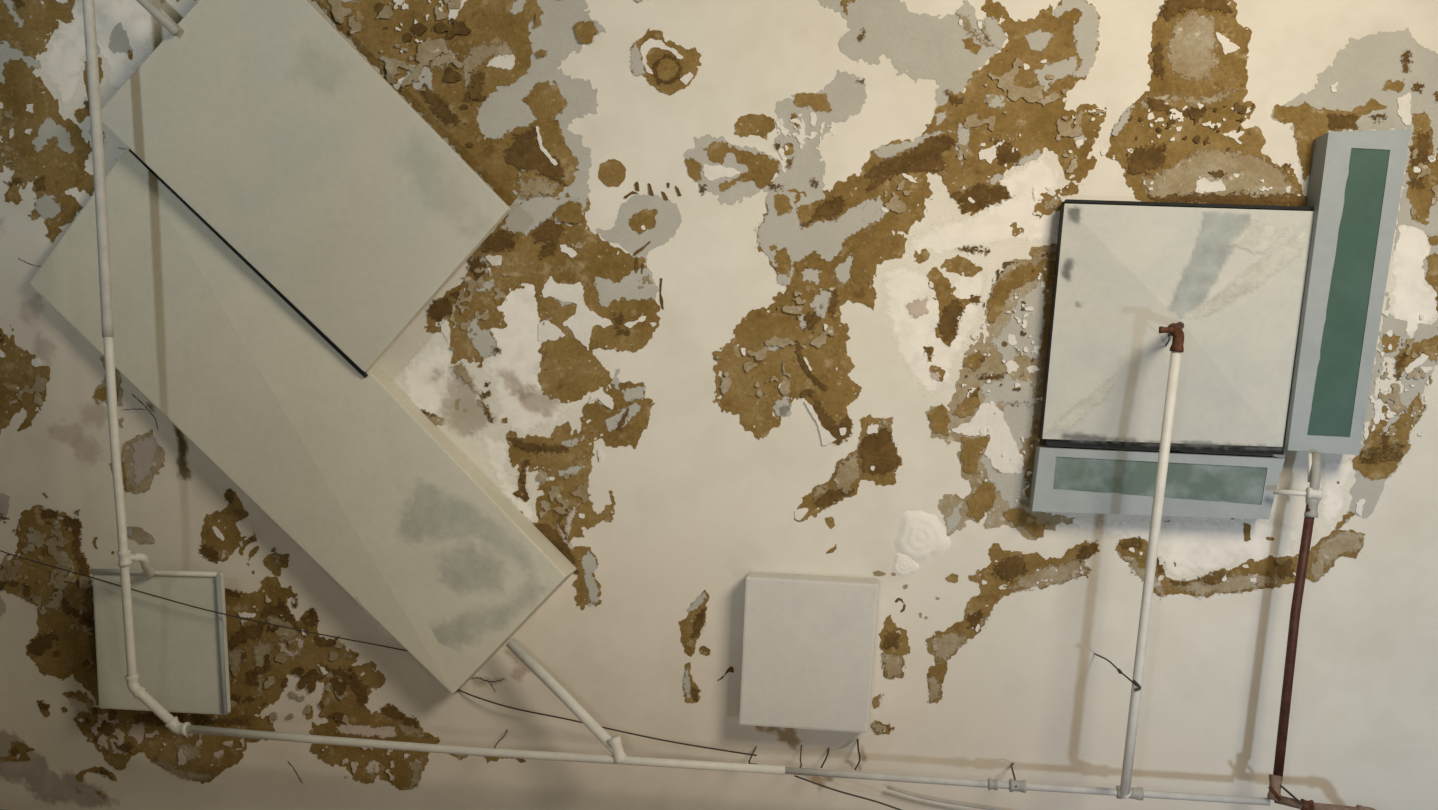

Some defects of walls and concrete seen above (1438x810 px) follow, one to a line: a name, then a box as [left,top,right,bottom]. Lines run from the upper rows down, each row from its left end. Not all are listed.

peeling [0,0,133,243]
spalling [629,28,702,96]
peeling [0,325,51,434]
peeling [92,355,165,494]
peeling [312,0,682,610]
peeling [684,0,1438,735]
peeling [0,489,526,799]
peeling [679,590,711,704]